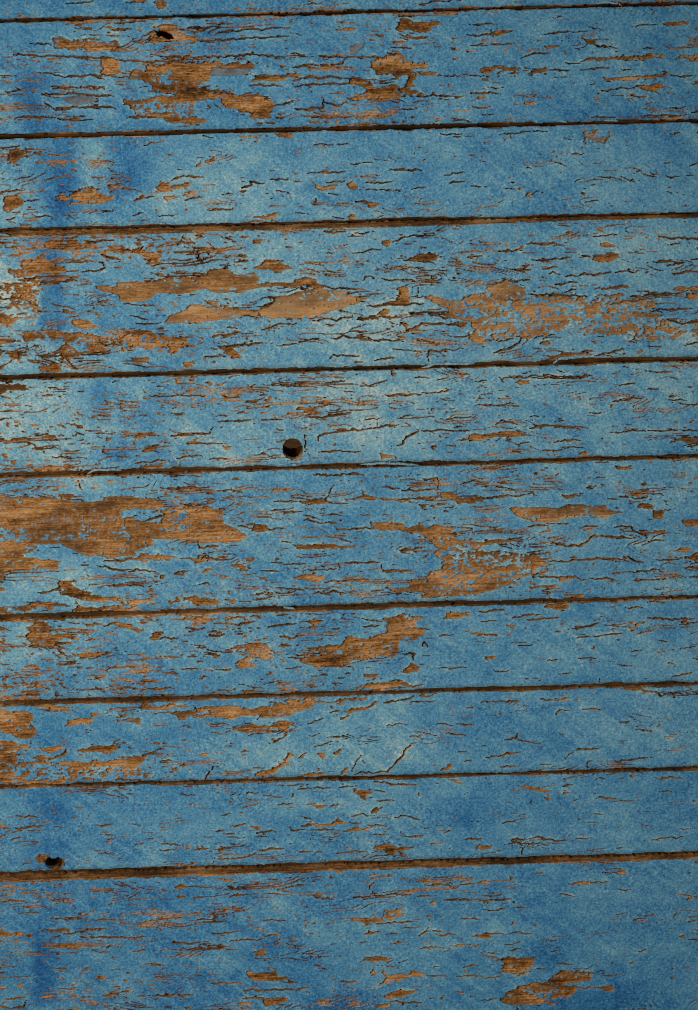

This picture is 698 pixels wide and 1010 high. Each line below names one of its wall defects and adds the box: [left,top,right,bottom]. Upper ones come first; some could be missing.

peeling [144,0,201,47]
peeling [394,15,445,43]
peeling [50,33,303,141]
peeling [343,53,440,105]
peeling [0,194,32,228]
peeling [252,211,281,222]
peeling [0,238,698,387]
peeling [0,380,33,398]
peeling [507,492,668,536]
peeling [681,517,698,529]
peeling [0,488,586,795]
peeling [498,953,617,1009]